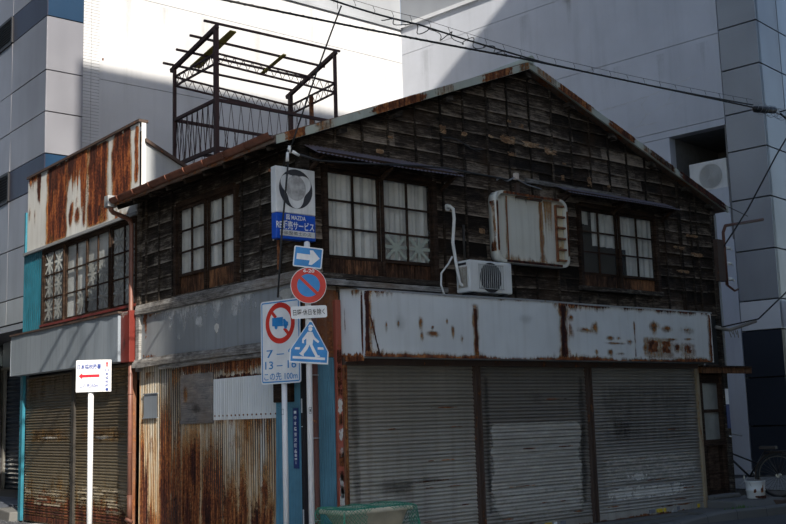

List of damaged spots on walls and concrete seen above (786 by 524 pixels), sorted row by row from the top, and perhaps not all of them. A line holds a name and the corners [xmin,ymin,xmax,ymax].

rust [372,93,427,114]
rust [29,126,139,245]
rust [489,191,563,267]
rust [172,358,261,391]
rust [342,290,713,506]
rust [140,403,274,524]
rust [24,481,127,524]